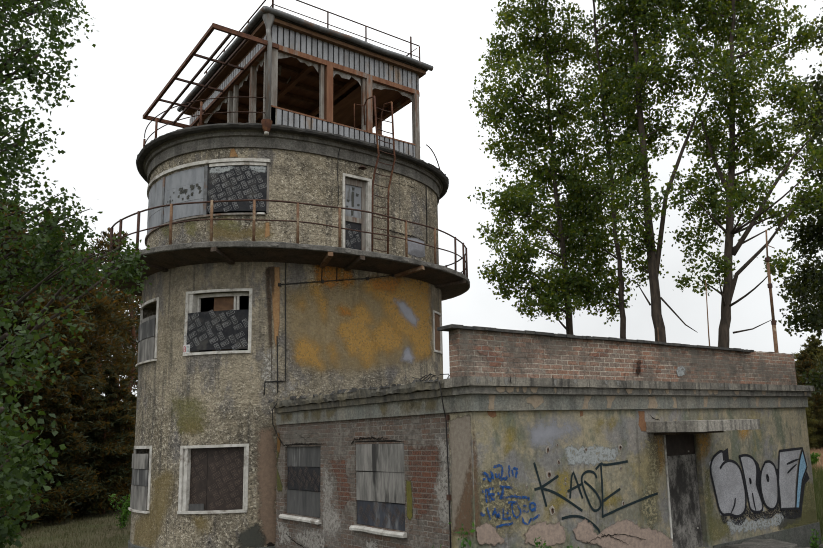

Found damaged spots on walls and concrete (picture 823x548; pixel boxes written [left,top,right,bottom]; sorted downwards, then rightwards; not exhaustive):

leakage [338,277,431,367]
flaking render [475,386,674,548]
crack [586,533,646,545]